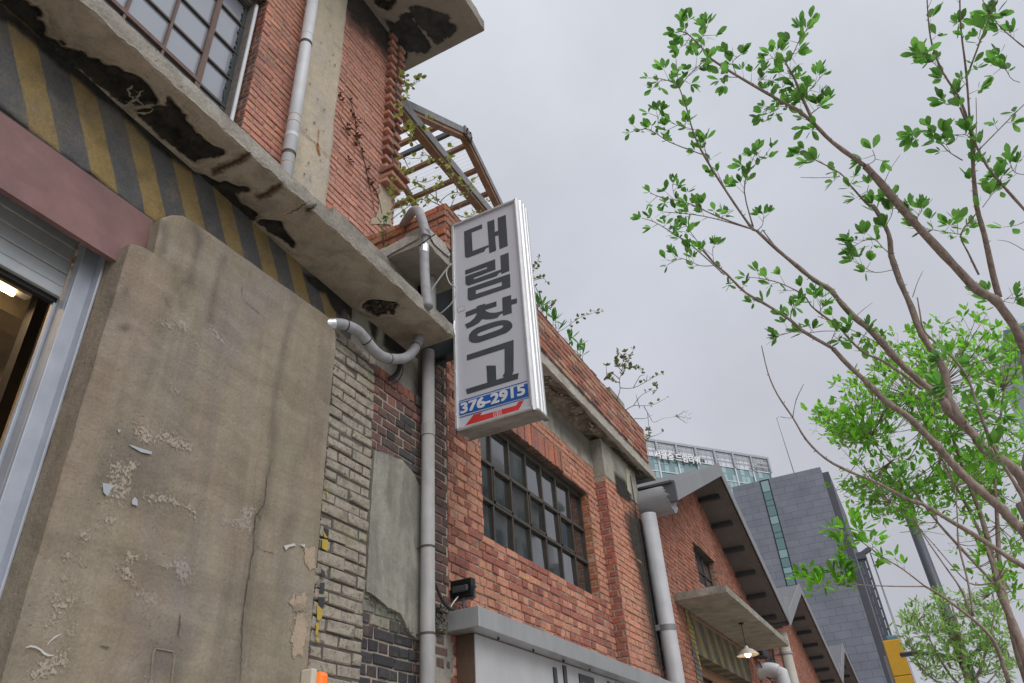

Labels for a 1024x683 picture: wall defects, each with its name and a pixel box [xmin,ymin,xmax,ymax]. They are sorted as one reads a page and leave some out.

spalling [0,0,295,248]
spalling [384,5,457,63]
spalling [362,300,398,317]
peeling [25,453,144,682]
peeling [131,421,195,457]
crack [240,463,275,681]
peeling [289,335,337,659]